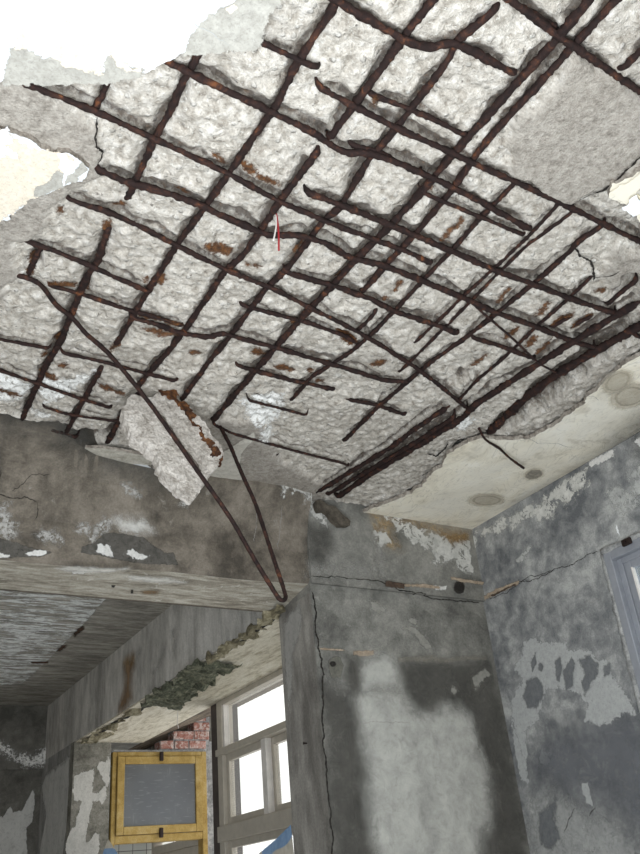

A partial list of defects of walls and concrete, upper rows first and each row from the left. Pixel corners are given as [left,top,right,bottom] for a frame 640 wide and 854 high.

rust [240,160,281,187]
rust [201,241,234,256]
rust [440,216,465,242]
spalling [0,0,640,603]
rust [551,311,593,330]
damp [602,371,640,409]
damp [525,470,542,479]
crack [309,551,599,854]
peeling [510,637,636,784]
damp [324,653,524,854]
peeling [0,753,111,854]
peeling [527,782,640,854]